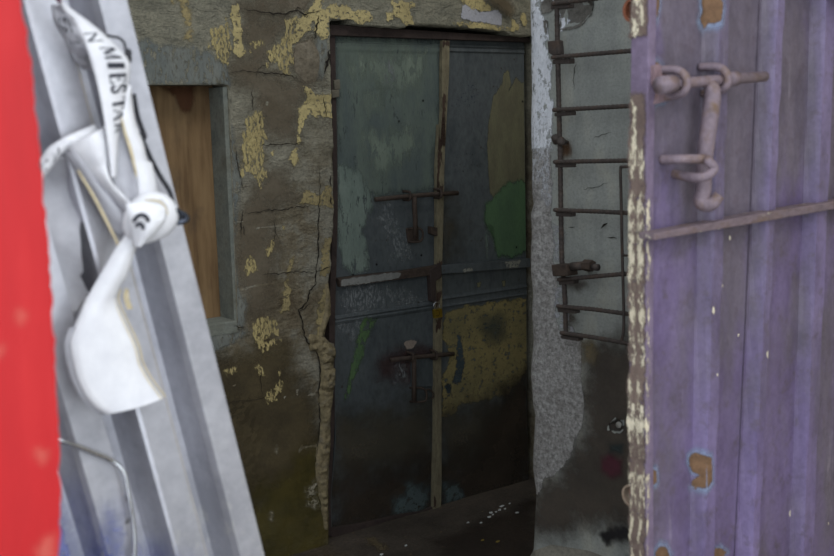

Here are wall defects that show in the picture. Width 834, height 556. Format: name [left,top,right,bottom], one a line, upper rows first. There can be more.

peeling [240,110,274,190]
crack [233,65,303,107]
crack [246,7,331,74]
peeling [208,0,373,75]
peeling [289,86,332,165]
peeling [386,0,415,26]
spalling [452,0,593,495]
peeling [252,256,294,353]
crack [240,173,332,462]
leakage [214,338,320,507]
spalling [308,237,336,530]
leakage [437,337,630,556]